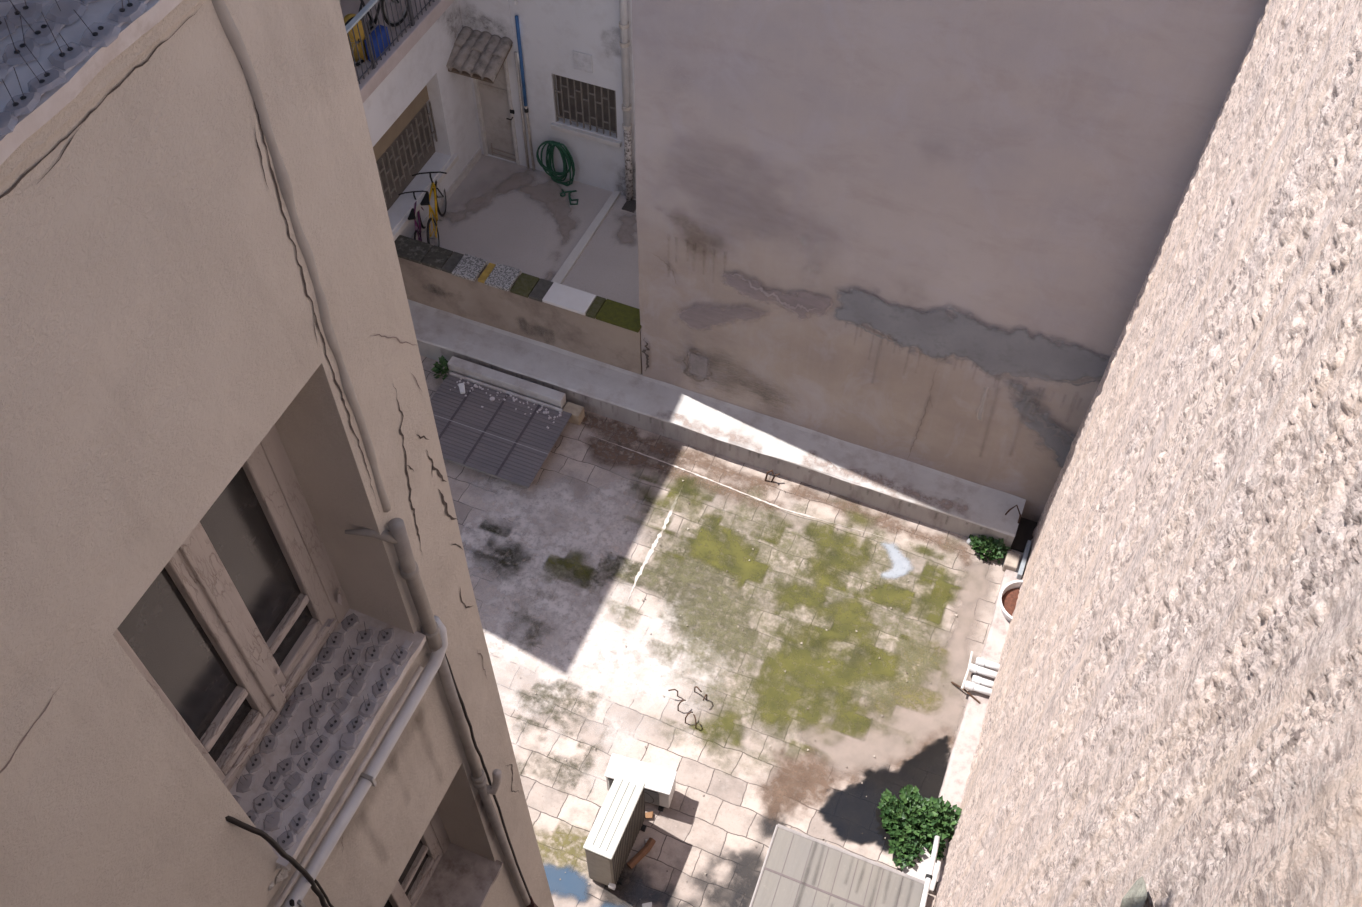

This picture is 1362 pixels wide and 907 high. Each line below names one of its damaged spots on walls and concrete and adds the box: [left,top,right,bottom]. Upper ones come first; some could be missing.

crack [239,61,463,552]
water stain [680,274,831,329]
crack [0,684,62,773]